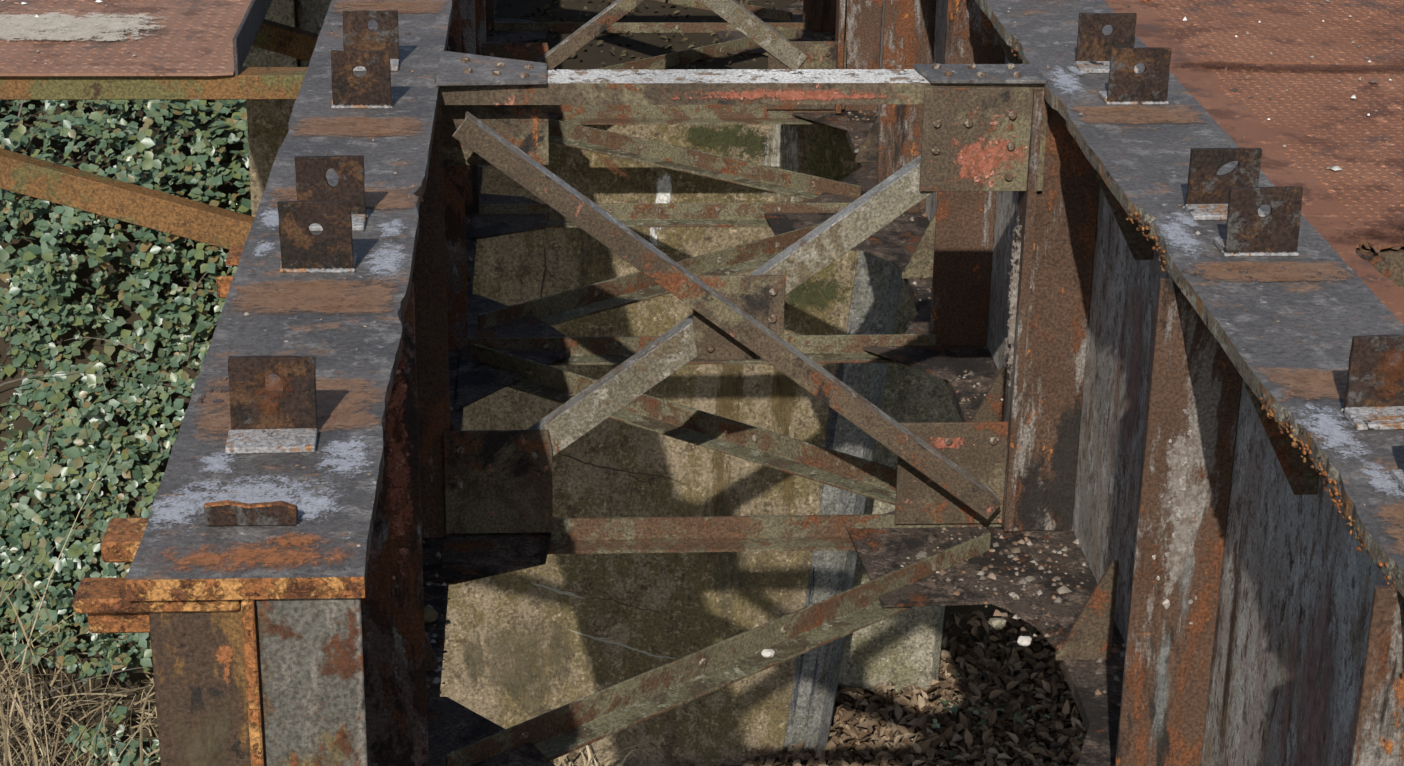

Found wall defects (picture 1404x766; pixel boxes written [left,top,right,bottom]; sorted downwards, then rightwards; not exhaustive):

rust [291,117,426,137]
rust [1189,261,1353,282]
rust [230,279,401,314]
rust [1264,368,1348,400]
rust [1373,503,1404,550]
rust [159,532,345,572]
rust [263,619,300,640]
rust [318,610,360,679]
rust [1206,519,1248,755]